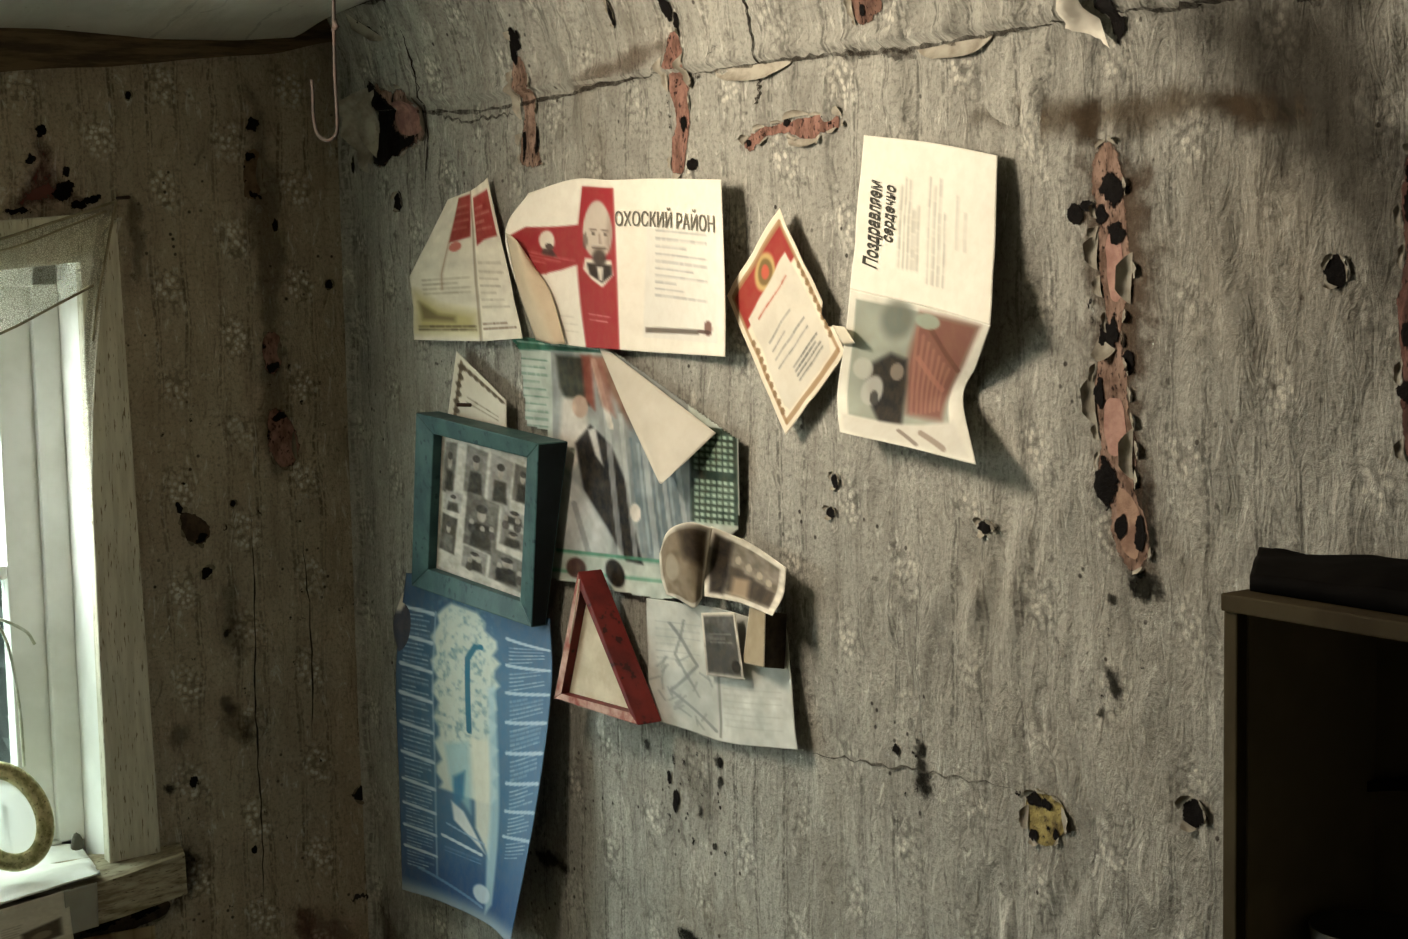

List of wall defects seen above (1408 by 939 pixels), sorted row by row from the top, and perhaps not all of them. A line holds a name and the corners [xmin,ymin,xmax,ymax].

crack [1118,0,1233,13]
crack [694,0,1065,104]
crack [354,0,658,199]
peeling [782,110,809,120]
peeling [1083,234,1098,270]
peeling [1115,252,1133,304]
peeling [1080,337,1116,425]
peeling [1118,429,1133,479]